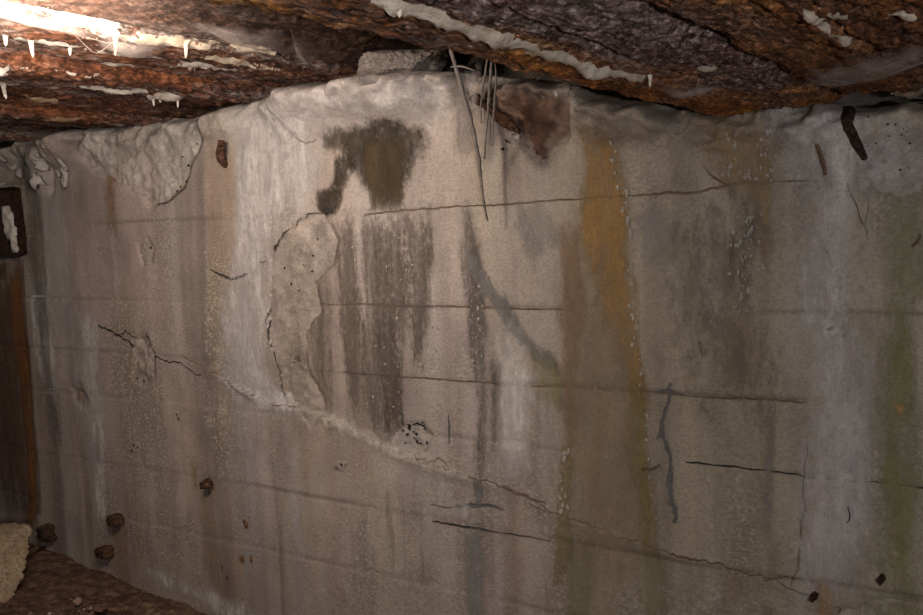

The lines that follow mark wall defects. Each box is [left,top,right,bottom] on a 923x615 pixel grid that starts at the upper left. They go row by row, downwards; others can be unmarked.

corrosion [0,264,38,523]
peeling [0,152,69,189]
spalling [55,114,204,207]
leakage [0,0,282,107]
crack [210,212,329,280]
spalling [266,214,345,427]
leakage [222,76,483,518]
leakage [462,212,562,475]
spalling [486,86,571,164]
crack [364,167,871,239]
crack [321,371,923,614]
leakage [787,107,867,586]